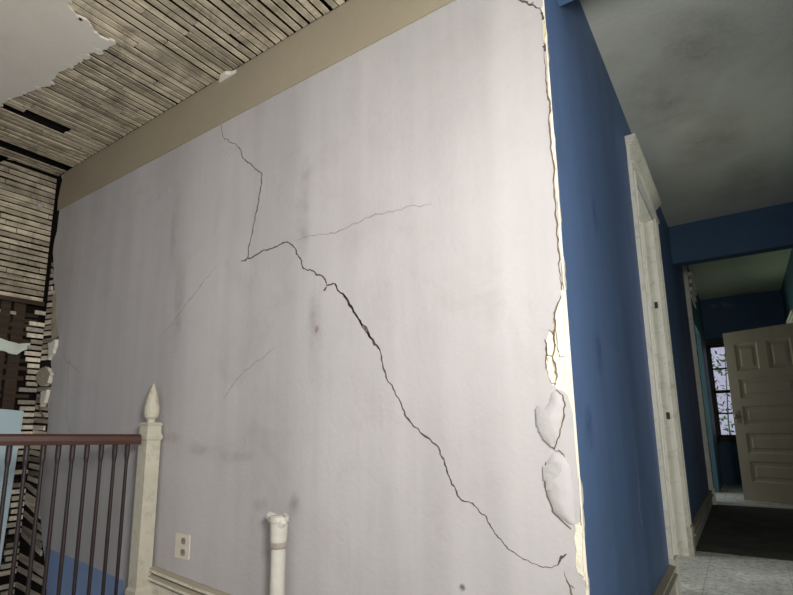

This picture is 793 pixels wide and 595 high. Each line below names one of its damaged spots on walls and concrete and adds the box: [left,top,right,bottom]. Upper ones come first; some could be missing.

flaking render [0,445,47,595]
flaking render [0,0,348,434]
crack [221,126,575,595]
spalling [574,477,590,595]